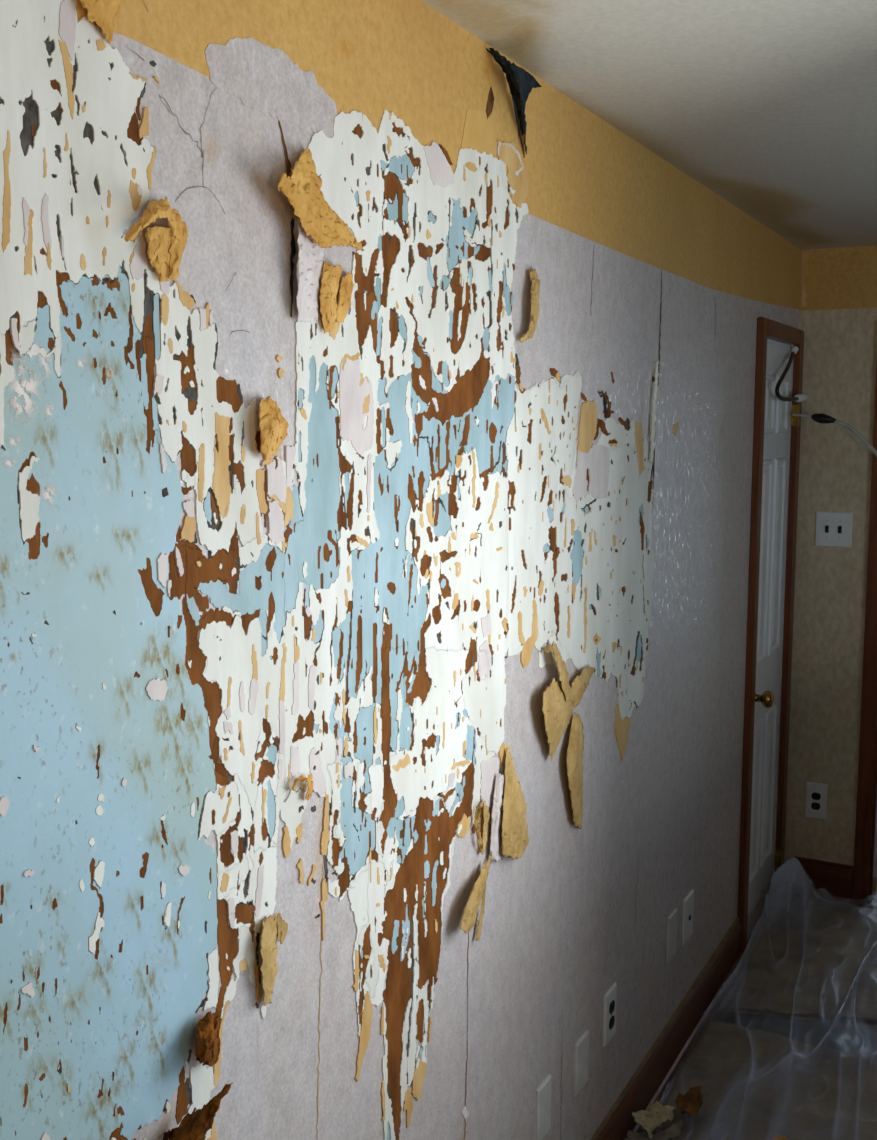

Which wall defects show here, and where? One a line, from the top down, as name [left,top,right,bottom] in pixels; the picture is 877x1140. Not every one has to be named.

crack [159,89,225,213]
peeling [0,0,656,1140]